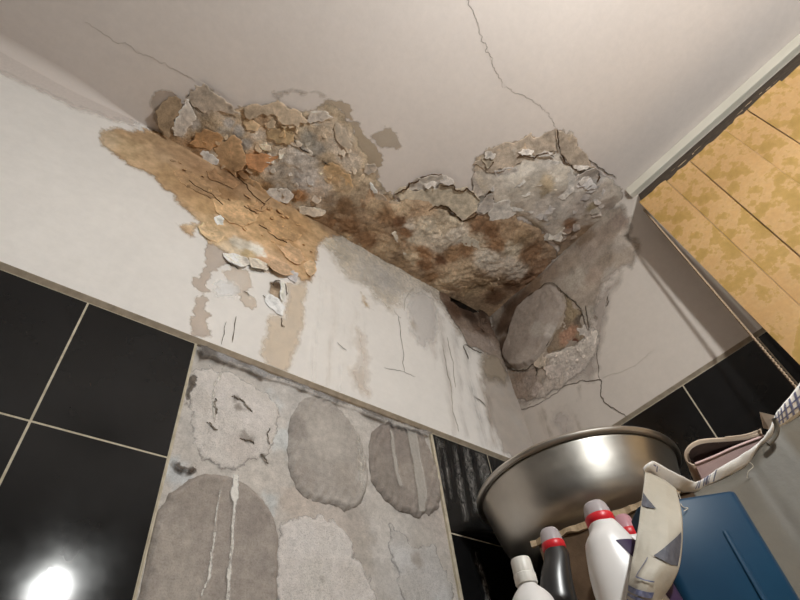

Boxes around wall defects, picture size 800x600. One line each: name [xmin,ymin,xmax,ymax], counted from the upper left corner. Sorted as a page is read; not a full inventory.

crack [468,0,554,126]
leakage [99,113,451,371]
spalling [155,83,623,326]
spalling [189,345,346,470]
spalling [507,324,598,401]
crack [513,282,609,330]
crack [521,349,654,417]